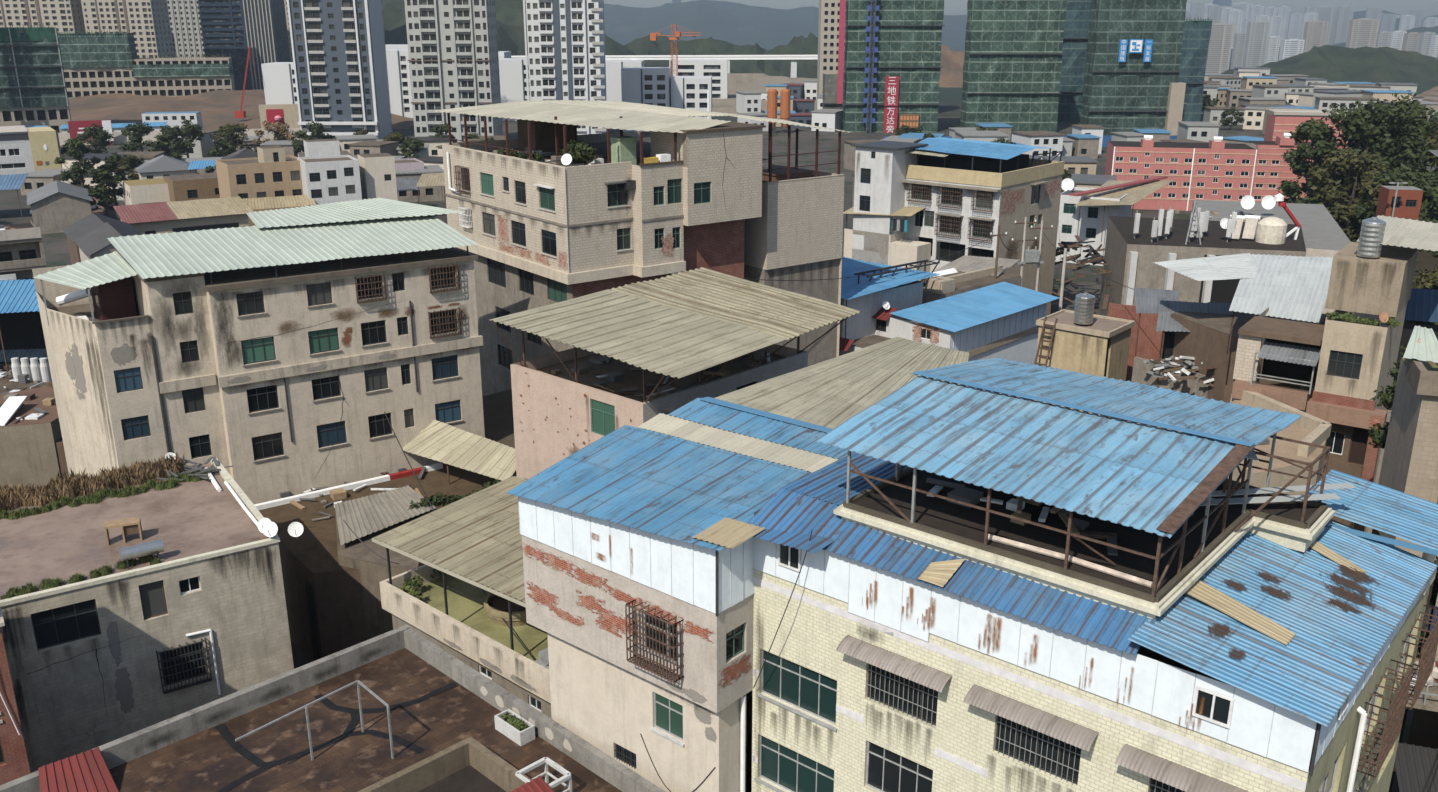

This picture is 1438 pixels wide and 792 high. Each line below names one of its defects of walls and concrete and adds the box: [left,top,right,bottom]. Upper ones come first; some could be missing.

flaking render [65,344,87,400]
flaking render [520,541,713,643]
corrosion [902,587,935,629]
corrosion [1224,572,1292,600]
corrosion [1319,565,1379,613]
corrosion [978,615,1001,653]
corrosion [1208,623,1246,660]